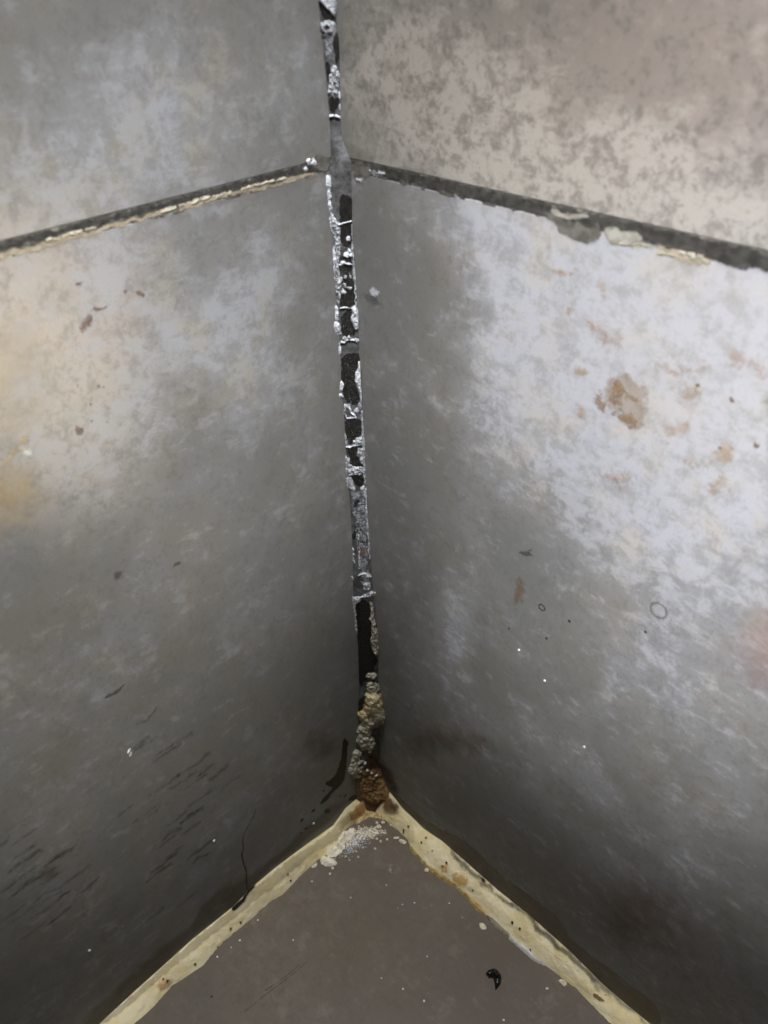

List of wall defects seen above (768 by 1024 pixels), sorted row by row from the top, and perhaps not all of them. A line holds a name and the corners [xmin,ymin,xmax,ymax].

rust [595,380,637,429]
damp [300,724,376,822]
crack [232,810,256,910]
damp [311,826,387,869]